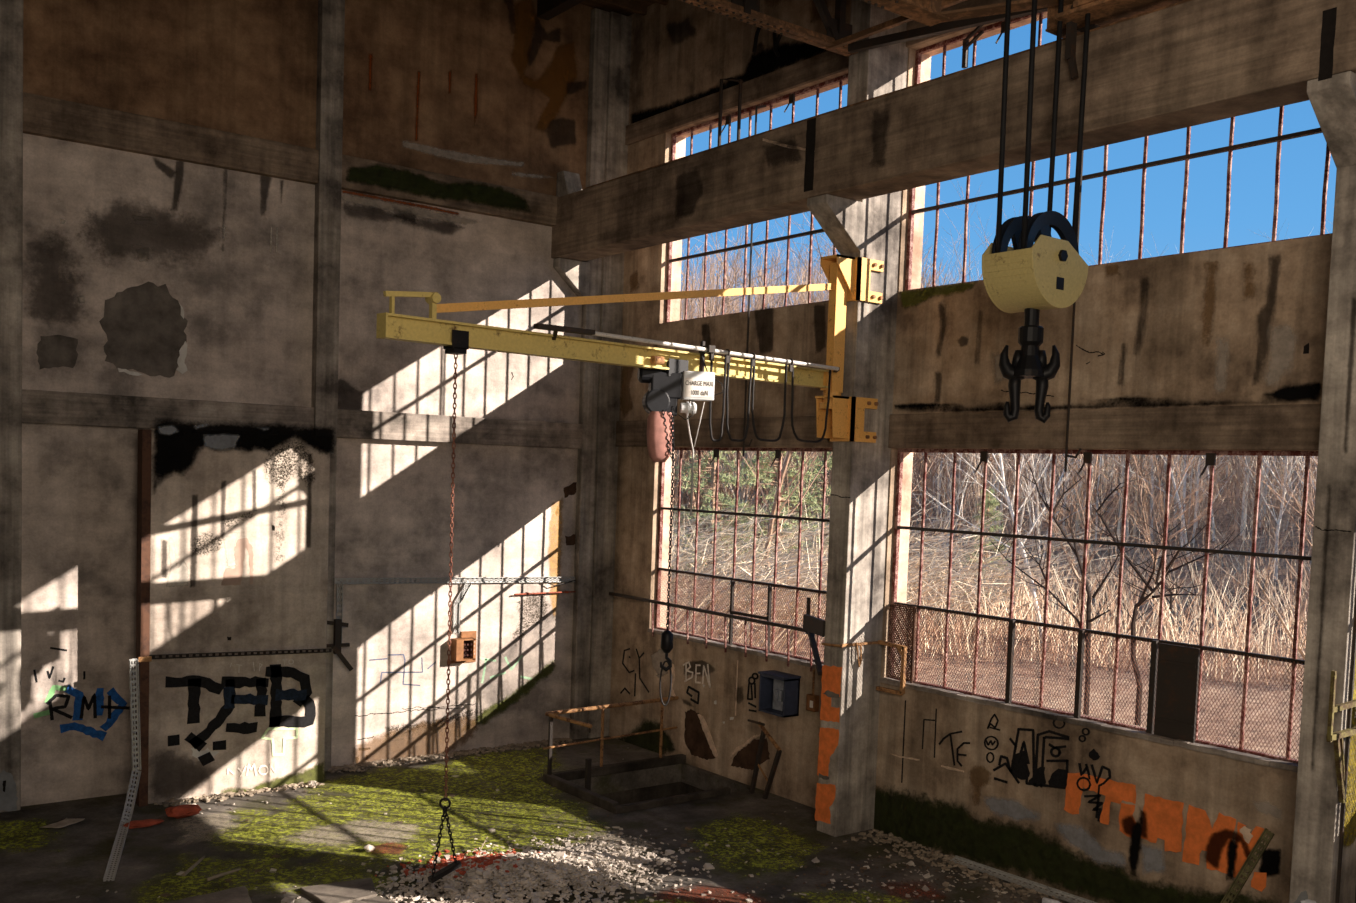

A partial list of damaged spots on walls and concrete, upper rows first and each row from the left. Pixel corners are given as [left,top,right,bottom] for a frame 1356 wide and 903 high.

leakage [89,159,225,256]
leakage [261,176,282,213]
spalling [99,281,188,378]
flaking render [197,425,238,449]